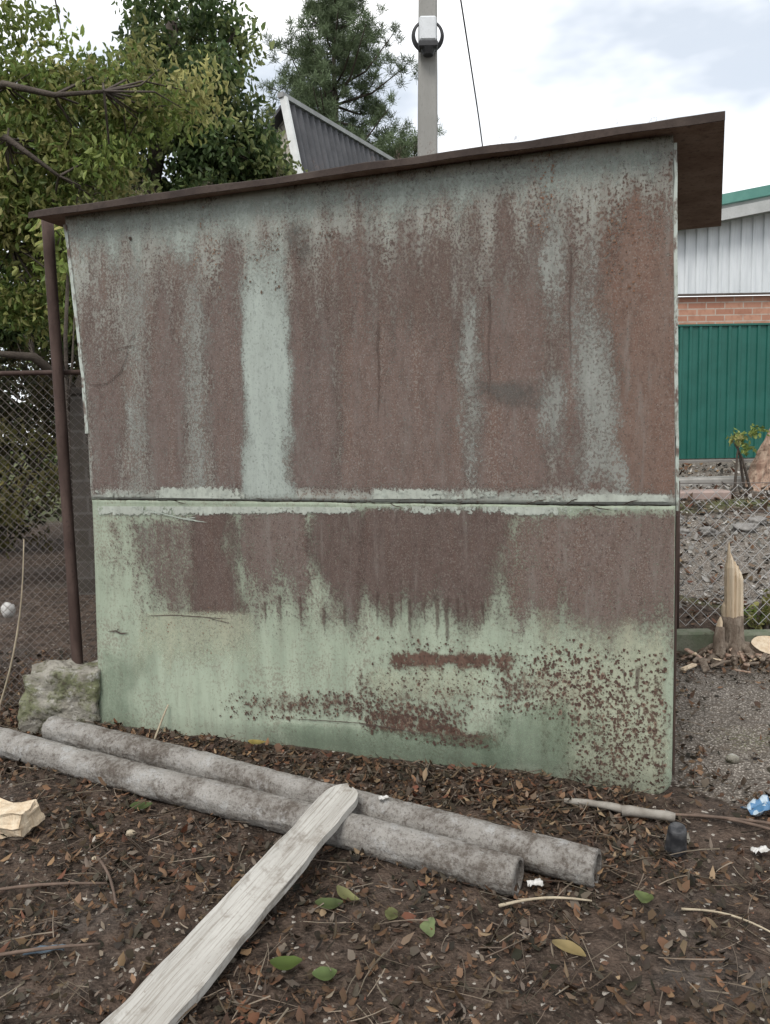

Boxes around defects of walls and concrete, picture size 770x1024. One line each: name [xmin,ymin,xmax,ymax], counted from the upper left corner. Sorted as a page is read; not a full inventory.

rust [76,139,675,791]